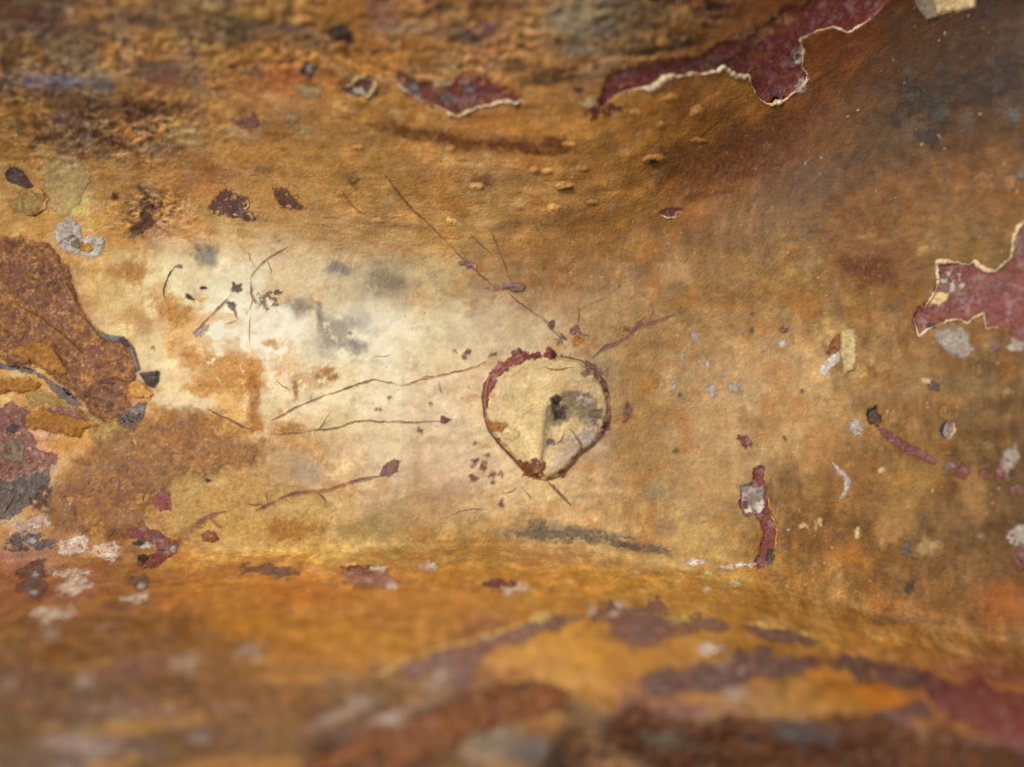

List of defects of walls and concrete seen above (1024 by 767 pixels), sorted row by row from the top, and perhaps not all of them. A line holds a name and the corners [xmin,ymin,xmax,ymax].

peeling [392,70,525,119]
peeling [575,0,887,121]
leakage [226,282,242,310]
leakage [254,289,282,310]
crack [385,175,676,358]
peeling [912,222,1024,341]
corrosion [0,235,264,562]
crack [208,355,483,435]
peeling [0,401,58,483]
crack [194,459,400,528]
crack [505,483,570,505]
peeling [685,465,779,595]